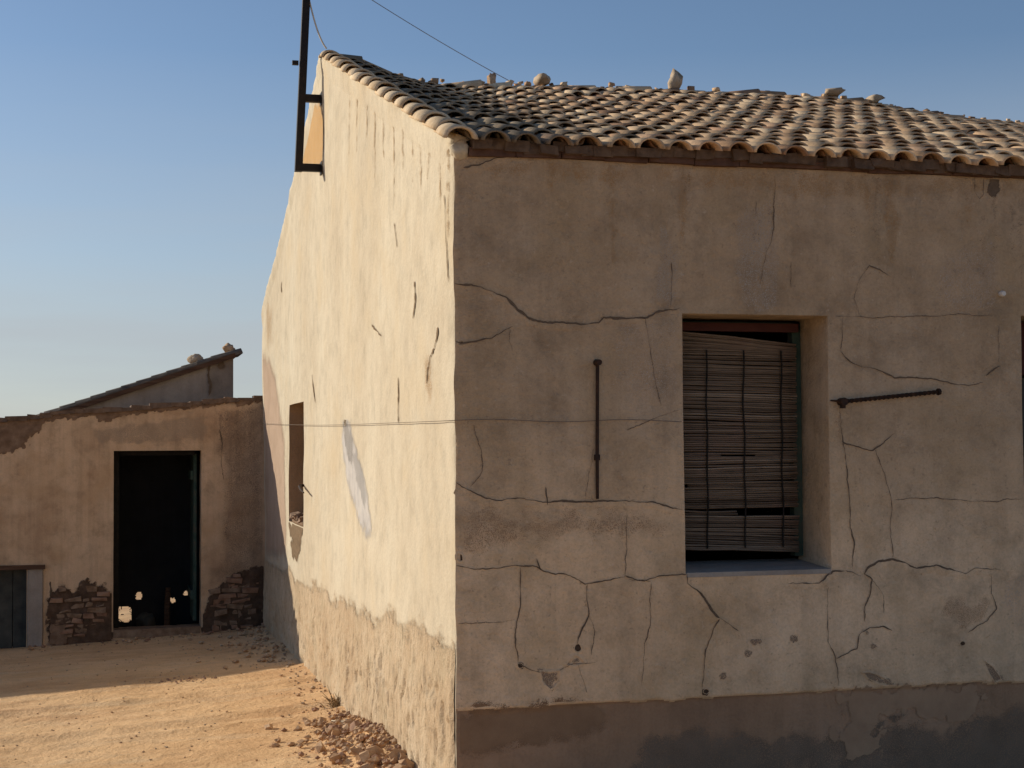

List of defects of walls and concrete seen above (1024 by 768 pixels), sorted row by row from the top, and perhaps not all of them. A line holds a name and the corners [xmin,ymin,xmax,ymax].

flaking render [0,400,262,454]
crack [426,199,680,430]
crack [839,265,1001,386]
flaking render [45,577,113,646]
peeling [201,522,616,768]
crack [454,427,738,692]
water stain [629,701,1024,768]
crack [788,417,1014,681]